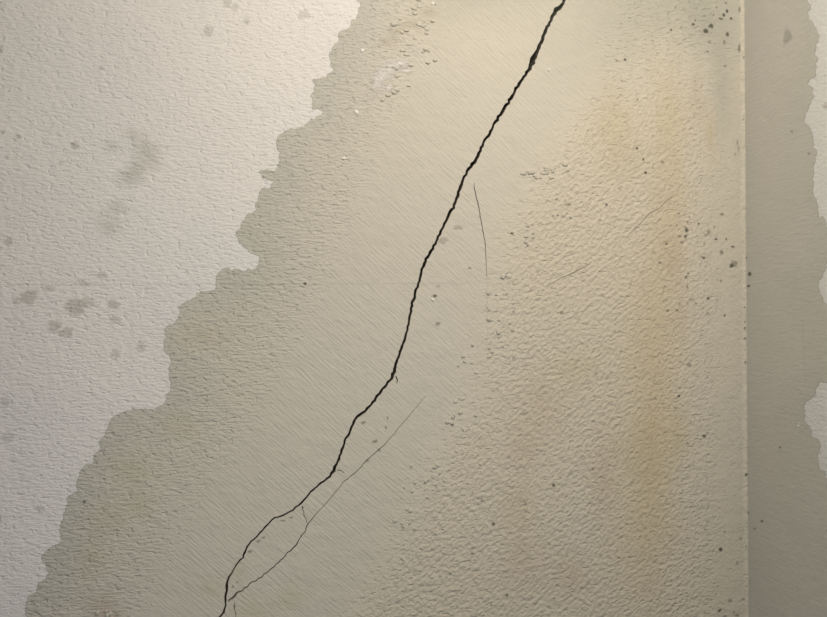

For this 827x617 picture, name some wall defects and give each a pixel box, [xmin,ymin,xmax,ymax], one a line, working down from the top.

crack [219,0,566,617]